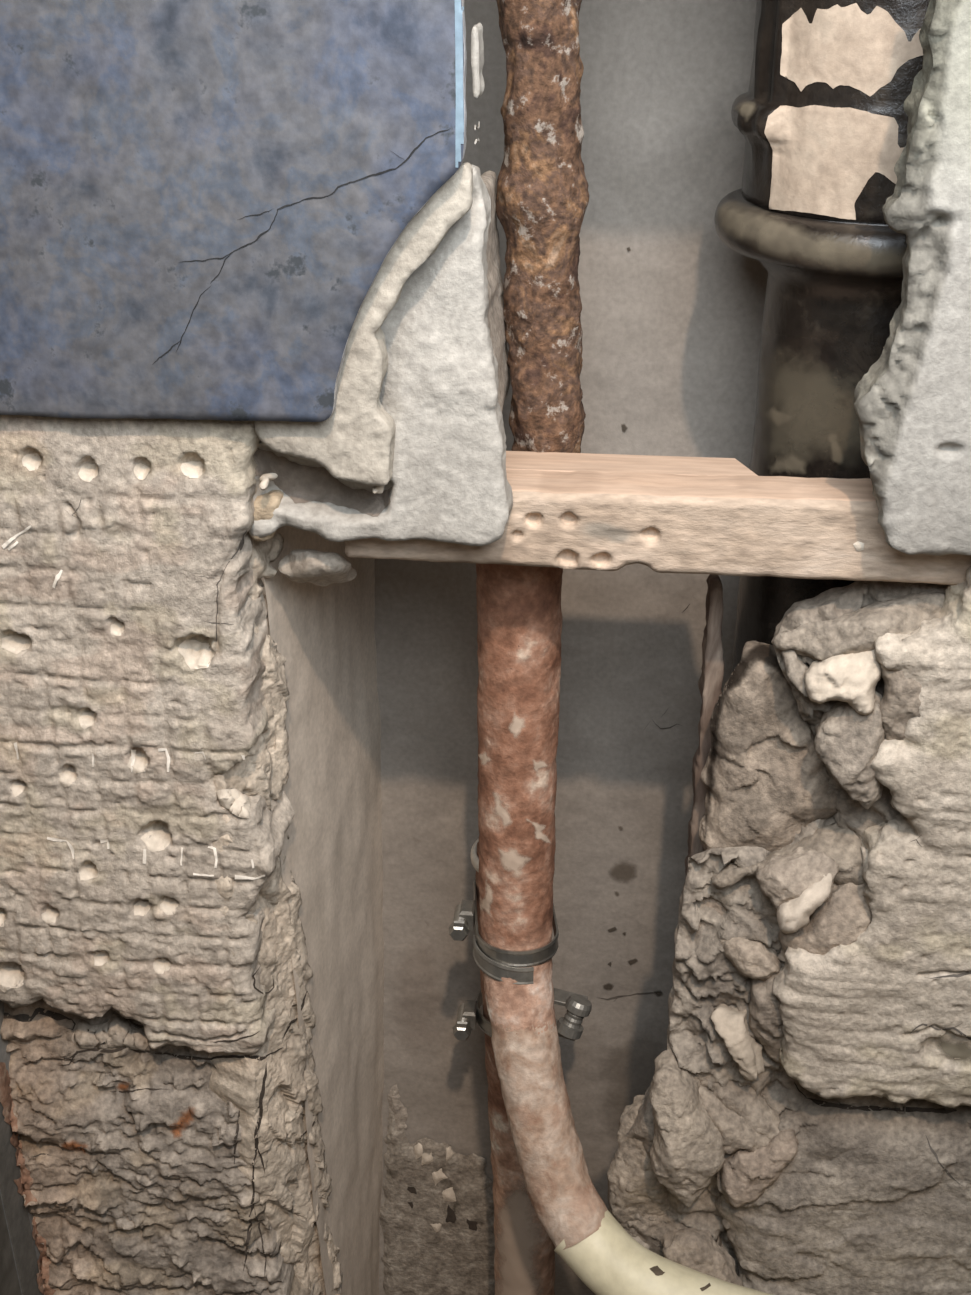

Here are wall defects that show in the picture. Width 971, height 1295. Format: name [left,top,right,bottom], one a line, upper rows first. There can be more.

crack [152,128,451,365]
crack [4,991,308,1277]
crack [252,959,274,994]
spalling [380,1084,495,1295]
spalling [939,1037,971,1063]